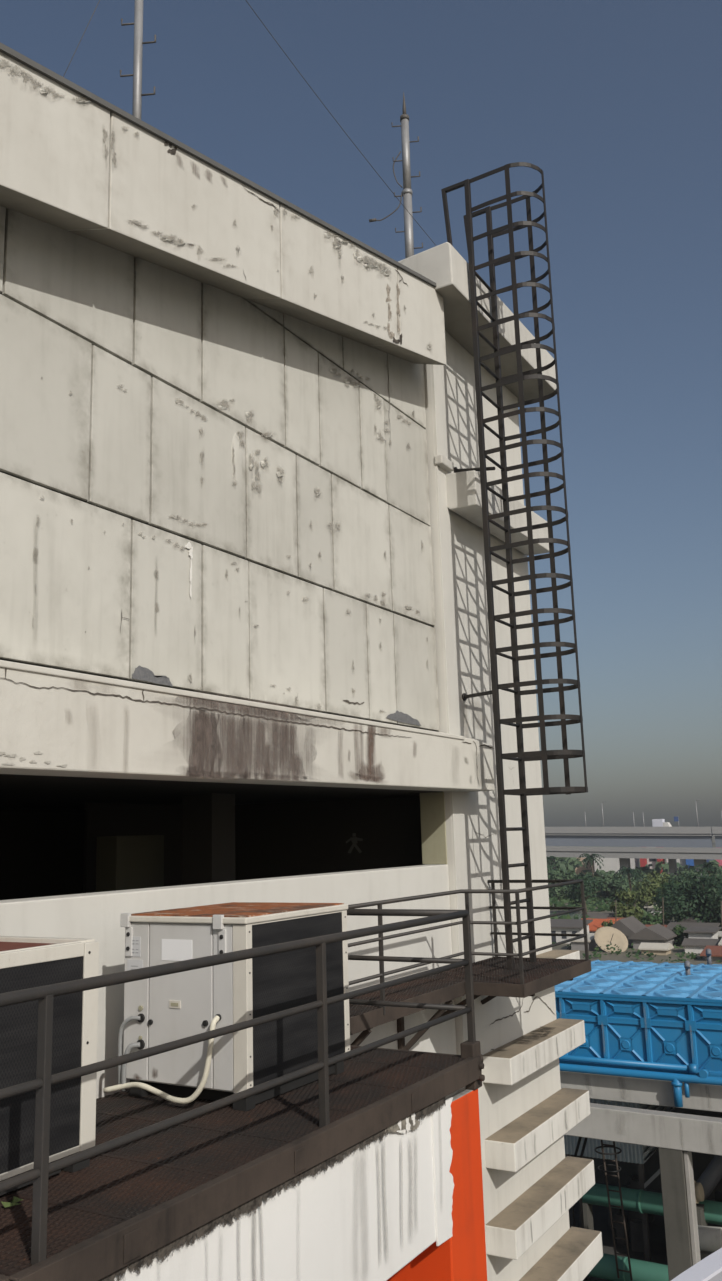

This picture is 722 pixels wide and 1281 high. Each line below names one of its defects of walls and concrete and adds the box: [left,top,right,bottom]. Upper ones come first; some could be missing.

peeling [128,220,240,267]
spalling [132,666,173,687]
crack [4,668,412,738]
spalling [380,710,421,726]
rust [364,725,382,781]
leakage [253,1213,263,1281]